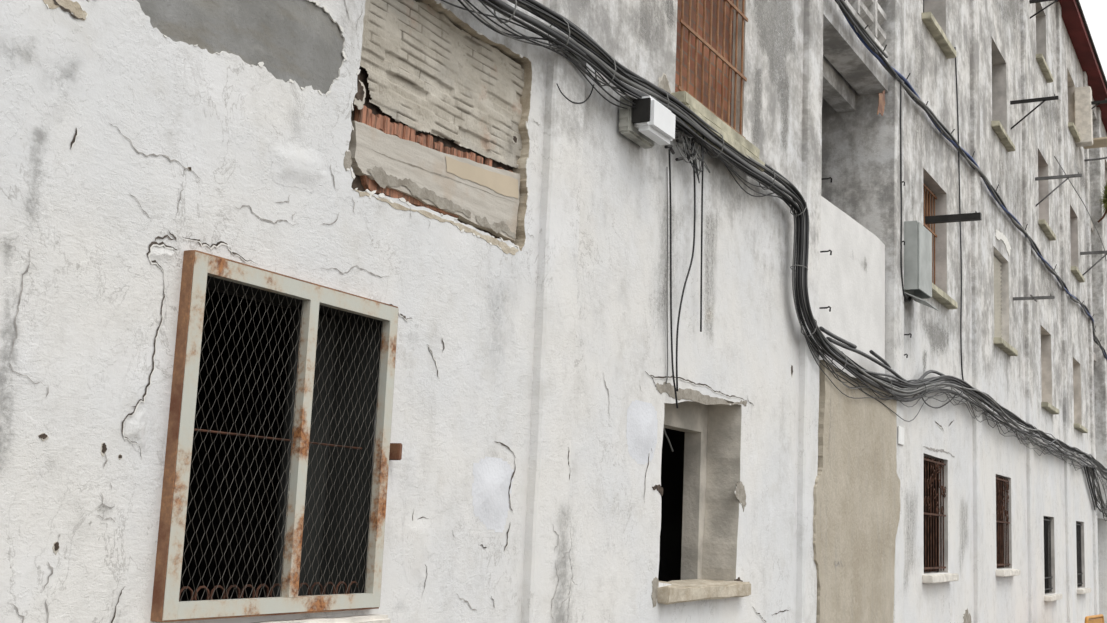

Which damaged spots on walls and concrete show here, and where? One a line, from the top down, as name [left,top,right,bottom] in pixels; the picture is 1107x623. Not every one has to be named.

peeling [43,0,90,20]
peeling [132,0,347,96]
crack [71,128,79,148]
spalling [344,0,532,255]
crack [108,122,258,458]
spalling [656,381,747,406]